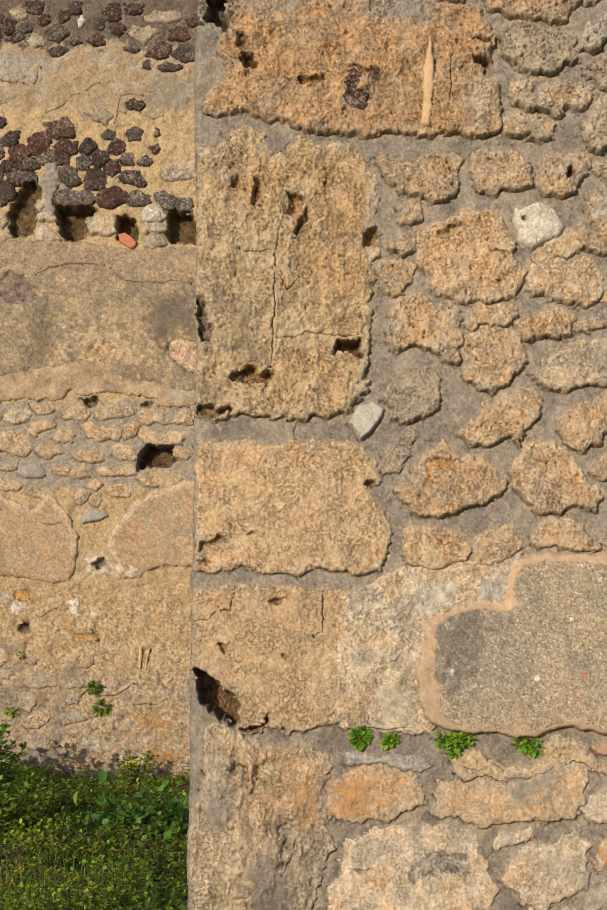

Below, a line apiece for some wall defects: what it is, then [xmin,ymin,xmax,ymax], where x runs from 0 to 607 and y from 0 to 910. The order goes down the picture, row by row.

crack [35,261,191,286]
spalling [190,667,271,734]